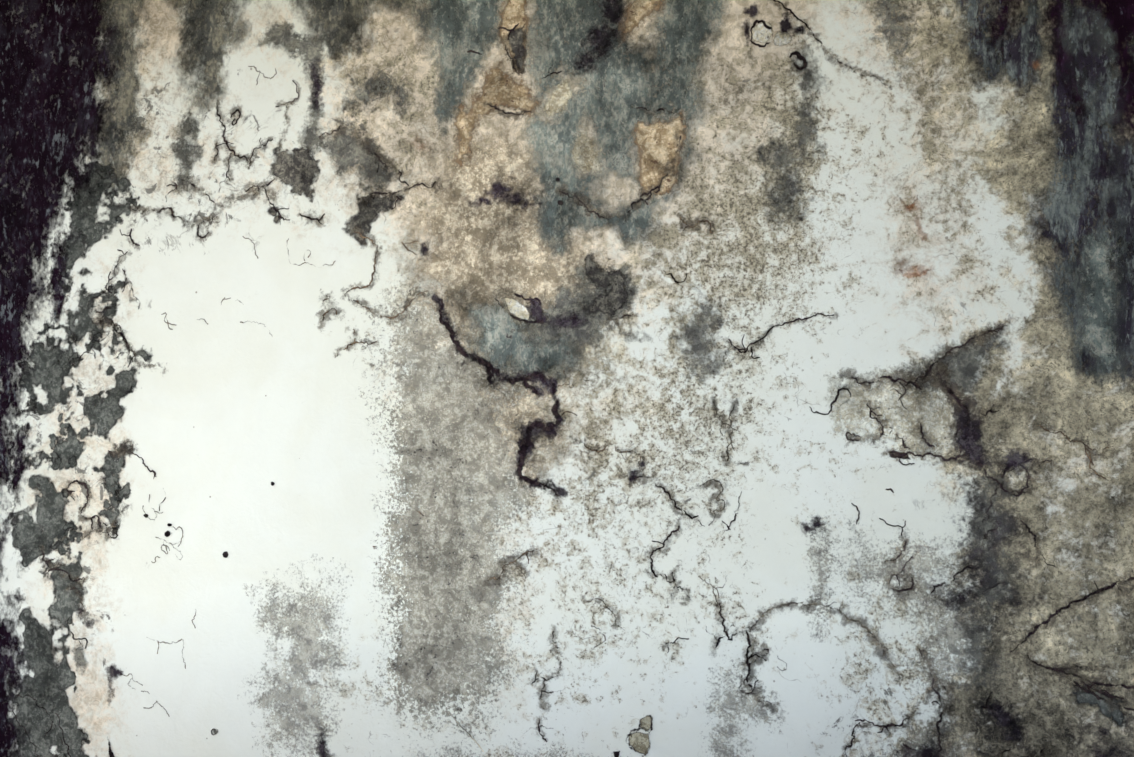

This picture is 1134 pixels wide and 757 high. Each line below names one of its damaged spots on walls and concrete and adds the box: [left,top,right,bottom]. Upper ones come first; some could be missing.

crack [79,66,335,370]
leakage [172,0,248,112]
peeling [454,0,667,172]
peeling [632,111,687,195]
leakage [0,0,149,757]
peeling [5,162,153,757]
leakage [292,0,729,757]
crack [317,125,1004,757]
crack [810,320,1113,604]
leakage [250,564,346,757]
peeling [613,715,653,757]
crack [1009,572,1134,711]